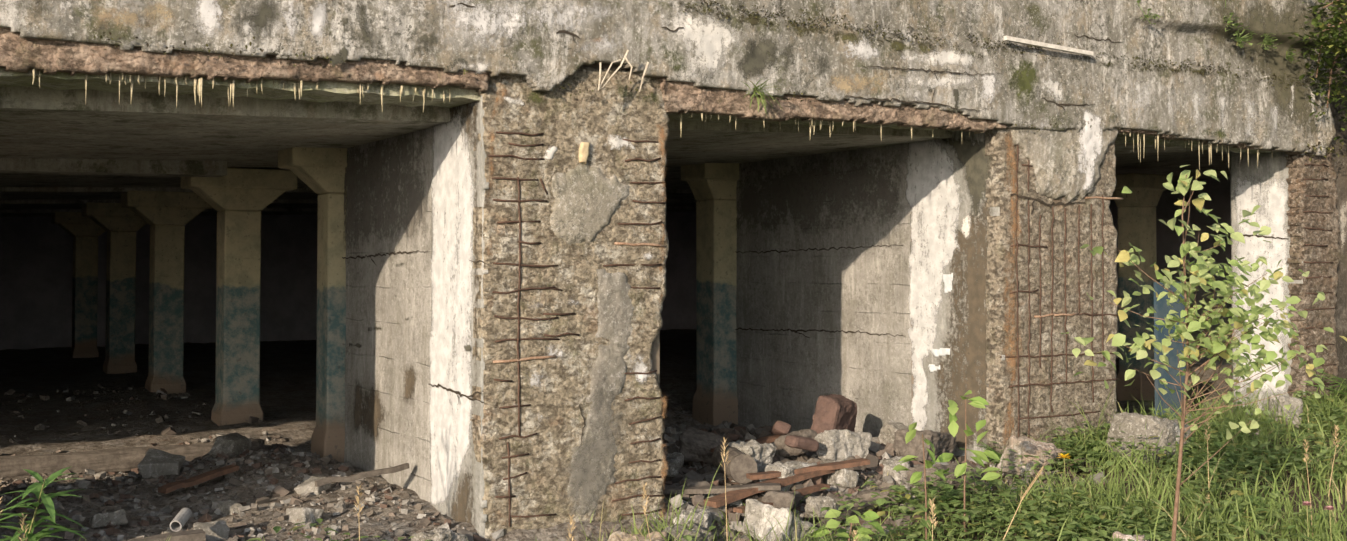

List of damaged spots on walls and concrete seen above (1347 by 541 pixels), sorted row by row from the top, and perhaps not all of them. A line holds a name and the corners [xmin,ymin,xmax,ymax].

leakage [196,0,296,37]
leakage [312,4,325,35]
leakage [329,5,373,68]
leakage [446,0,607,41]
leakage [661,12,792,78]
leakage [846,39,878,59]
leakage [902,51,995,114]
leakage [1213,3,1324,133]
spalling [0,27,1124,539]
spalling [1117,128,1341,407]
leakage [404,367,416,401]
crack [429,384,484,403]